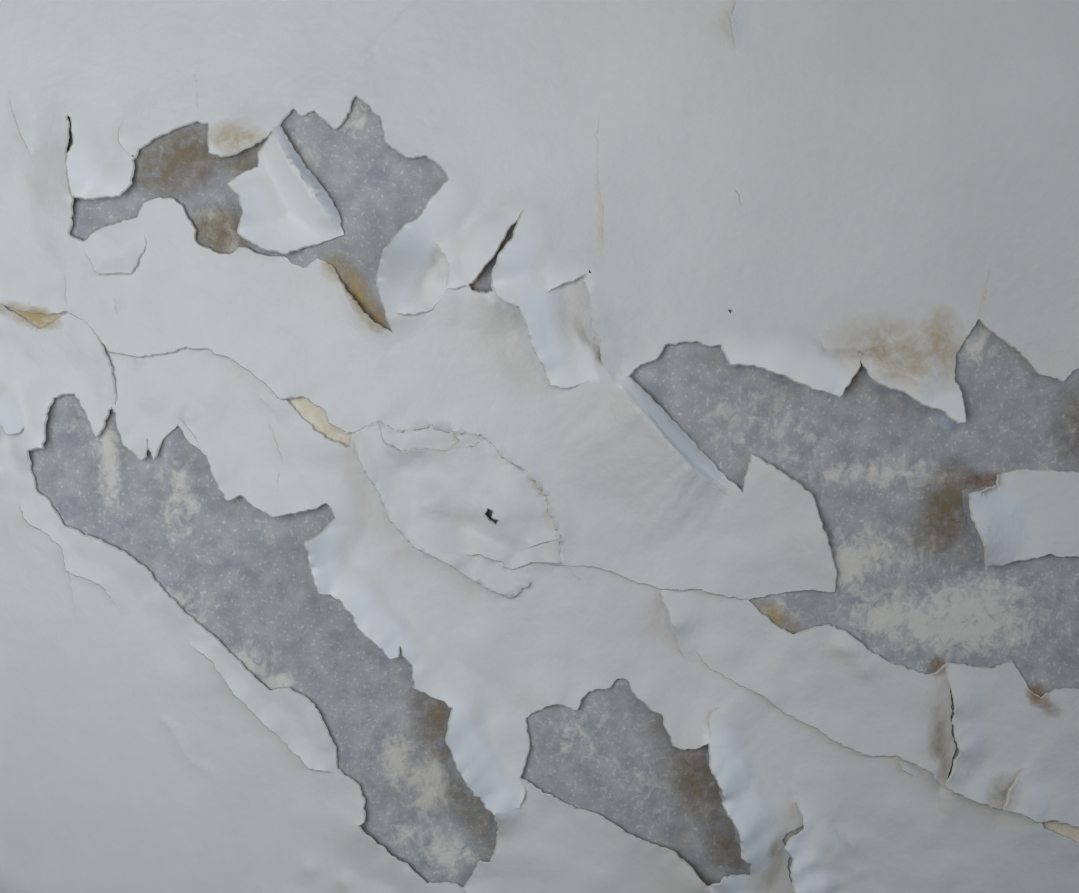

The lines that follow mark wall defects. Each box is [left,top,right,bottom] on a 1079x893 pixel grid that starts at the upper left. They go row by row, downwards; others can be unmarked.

peeling [0,374,889,893]
peeling [54,62,1079,709]